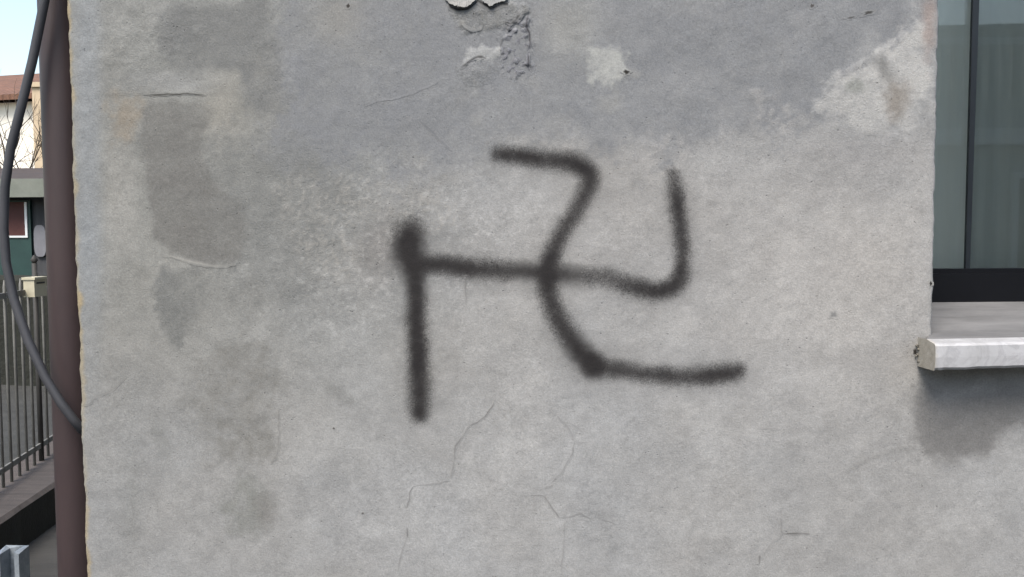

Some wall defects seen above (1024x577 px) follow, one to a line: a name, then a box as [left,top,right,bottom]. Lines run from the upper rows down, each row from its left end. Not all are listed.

spalling [446,0,540,83]
water stain [136,0,919,546]
crack [398,399,495,572]
crack [531,415,615,574]
water stain [845,365,1024,474]